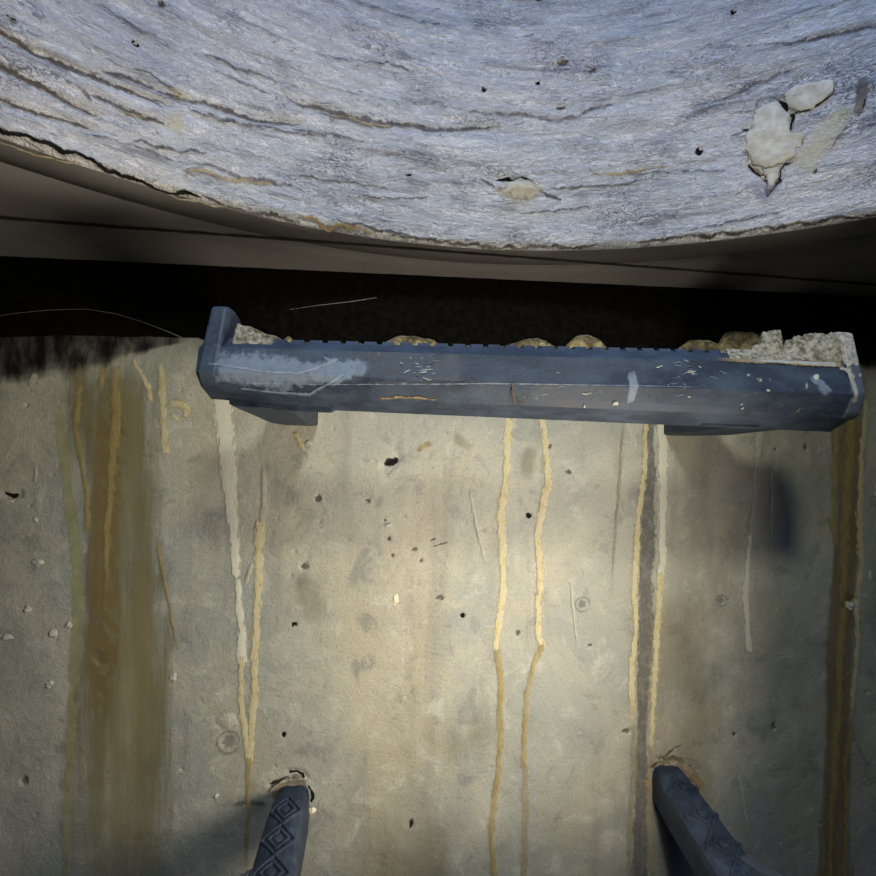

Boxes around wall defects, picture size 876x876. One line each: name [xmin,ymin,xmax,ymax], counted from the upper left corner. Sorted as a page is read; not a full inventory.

spalling [0,127,595,251]
spalling [635,214,876,243]
rust [60,368,167,843]
rust [819,398,869,876]
spalling [268,770,316,815]
spalling [642,745,705,789]